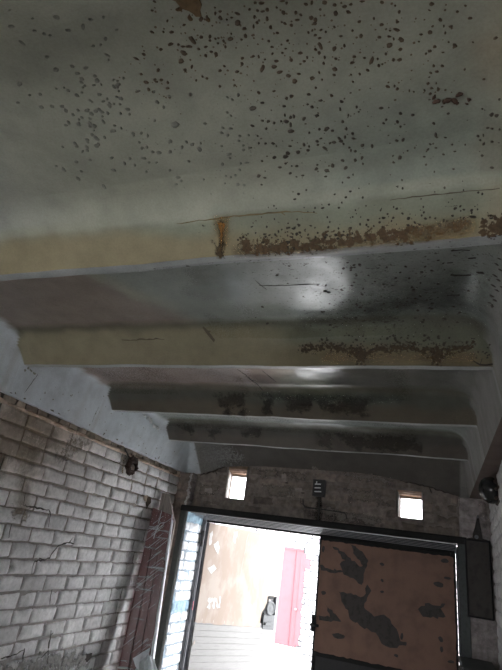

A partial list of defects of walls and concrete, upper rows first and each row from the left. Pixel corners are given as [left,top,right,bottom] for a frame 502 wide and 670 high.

spalling [150,0,373,194]
crack [392,188,500,200]
rust [212,220,227,259]
rust [237,219,472,256]
rust [478,213,502,239]
rust [298,338,476,366]
crack [32,539,74,568]